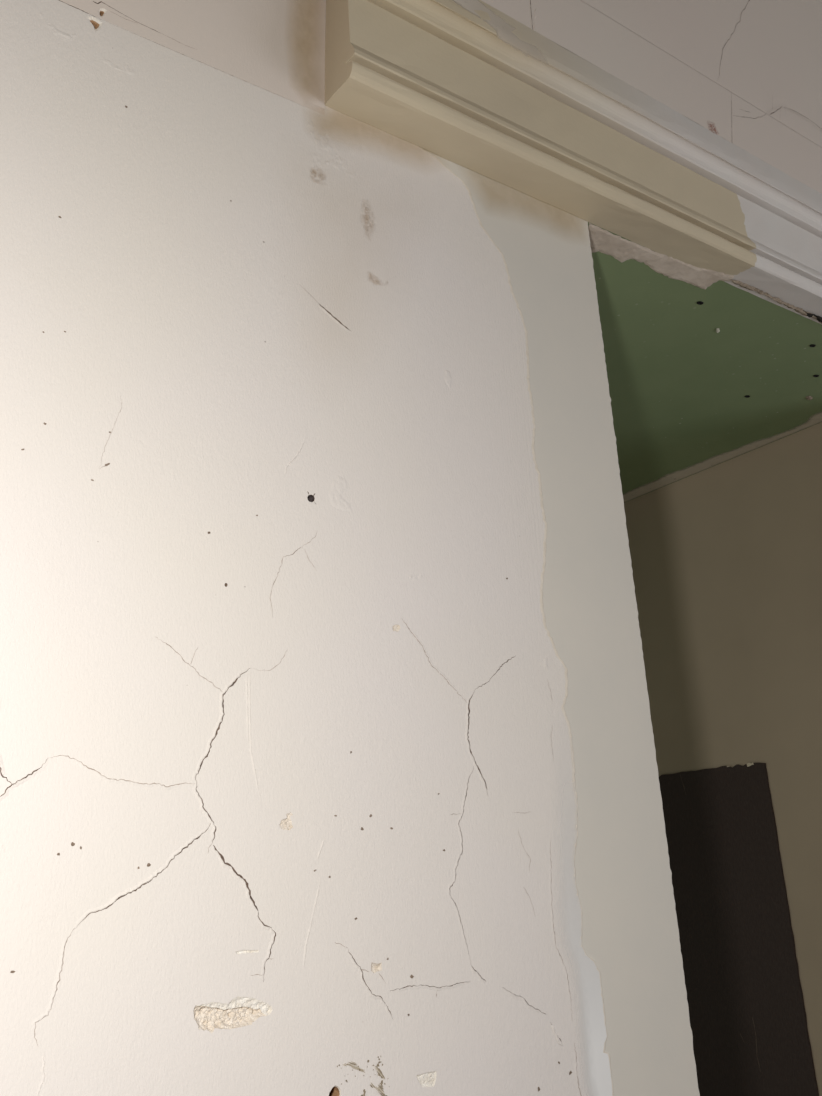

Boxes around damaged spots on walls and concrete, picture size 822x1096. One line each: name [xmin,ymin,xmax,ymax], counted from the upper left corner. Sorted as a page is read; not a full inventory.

crack [0,642,286,1048]
spalling [193,996,272,1034]
crack [336,617,561,1046]